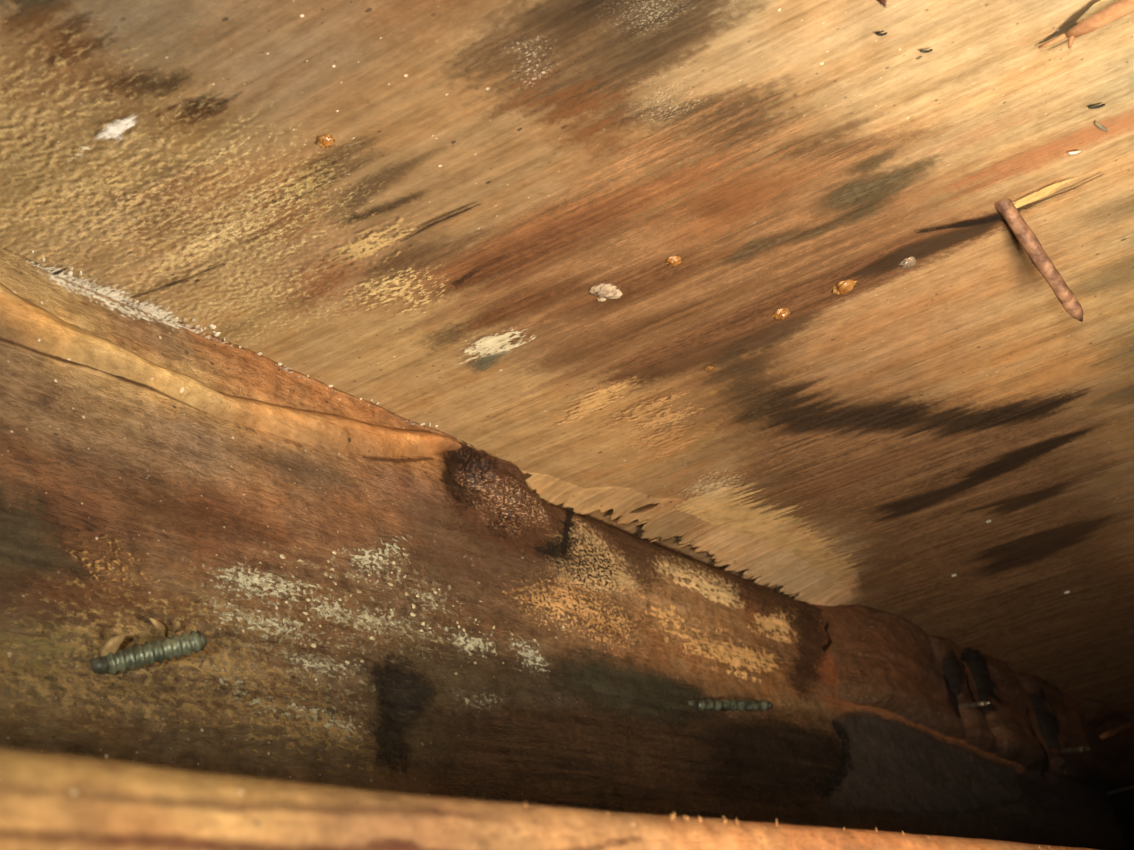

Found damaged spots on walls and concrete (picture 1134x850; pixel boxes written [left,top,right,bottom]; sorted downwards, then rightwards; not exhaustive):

leakage [42,16,104,65]
leakage [108,75,189,99]
leakage [0,91,427,348]
crack [0,338,186,404]
leakage [345,0,1134,715]
crack [371,456,434,464]
leakage [0,490,1023,821]